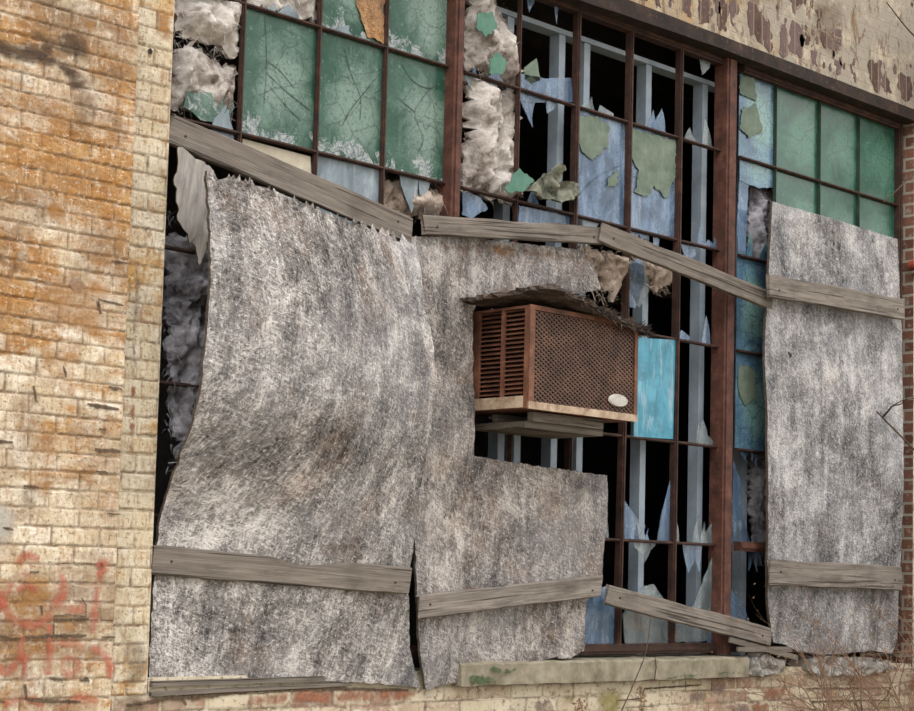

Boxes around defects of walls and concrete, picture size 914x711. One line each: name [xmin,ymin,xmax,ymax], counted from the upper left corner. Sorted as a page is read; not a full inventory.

damp [36,34,87,56]
peeling [646,0,857,82]
damp [58,65,82,88]
peeling [867,59,914,102]
peeling [739,74,763,138]